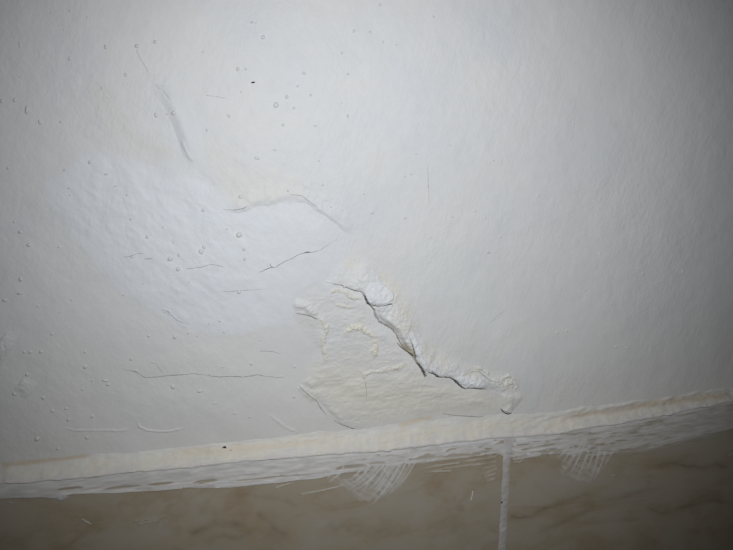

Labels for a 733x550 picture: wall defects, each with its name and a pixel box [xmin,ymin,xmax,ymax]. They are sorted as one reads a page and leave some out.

crack [342,285,476,389]